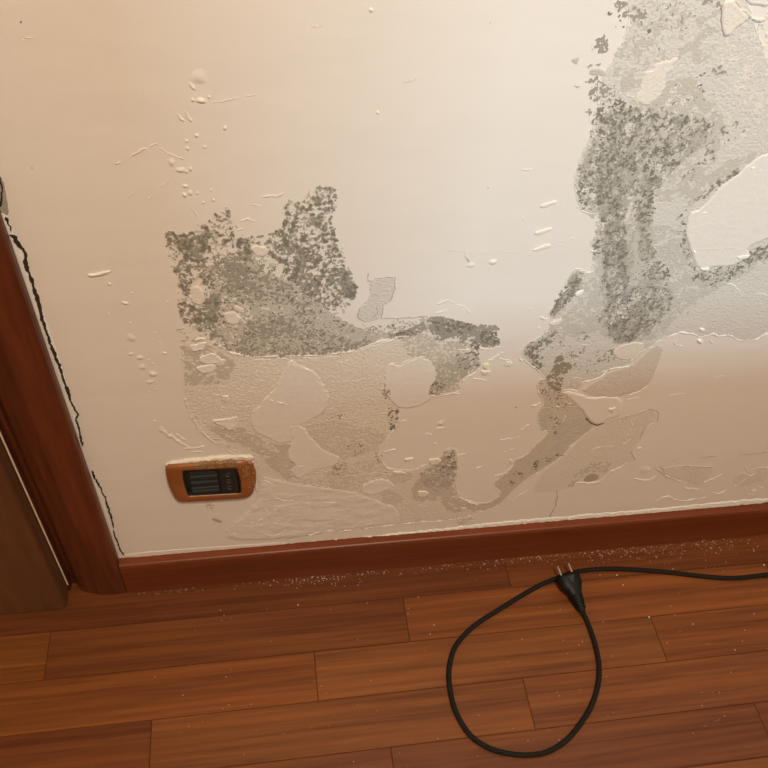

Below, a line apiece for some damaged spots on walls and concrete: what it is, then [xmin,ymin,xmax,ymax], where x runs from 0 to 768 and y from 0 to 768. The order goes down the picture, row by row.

crack [0,177,84,446]
water stain [165,185,501,396]
peeling [182,0,768,541]
water stain [524,0,768,470]
crack [92,471,124,555]